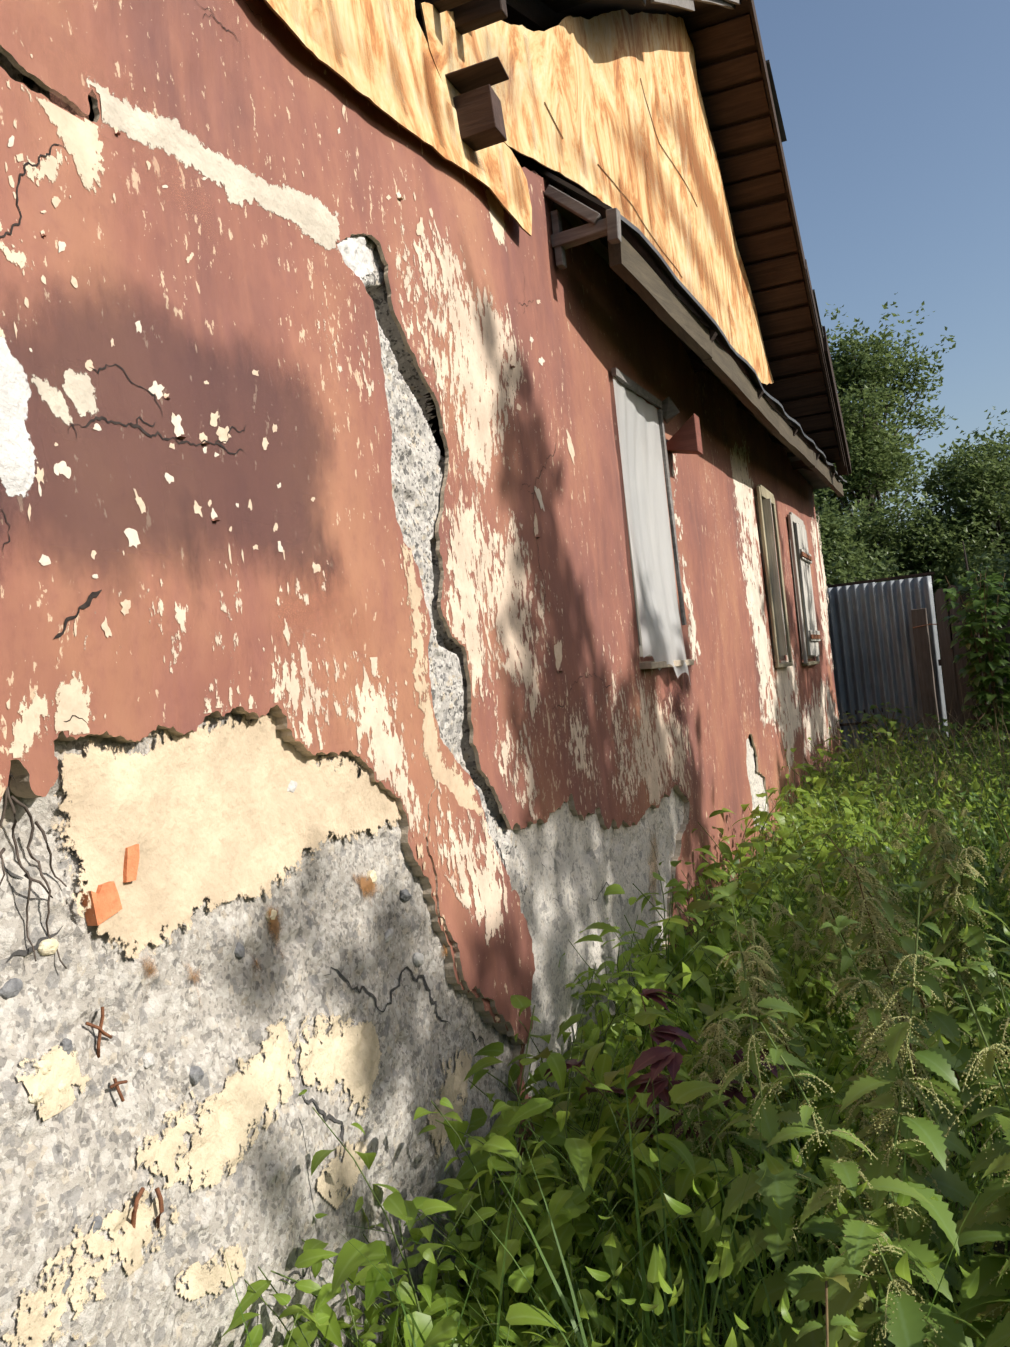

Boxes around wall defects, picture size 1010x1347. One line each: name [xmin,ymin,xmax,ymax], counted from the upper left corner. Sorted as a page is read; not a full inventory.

crack [0,53,84,118]
corrosion [426,57,450,146]
crack [0,144,67,238]
peeling [483,185,507,252]
corrosion [629,129,721,305]
corrosion [657,105,752,306]
crack [68,363,247,455]
crack [54,589,102,639]
crack [336,235,534,913]
peeling [730,437,841,829]
spalling [0,208,701,1347]